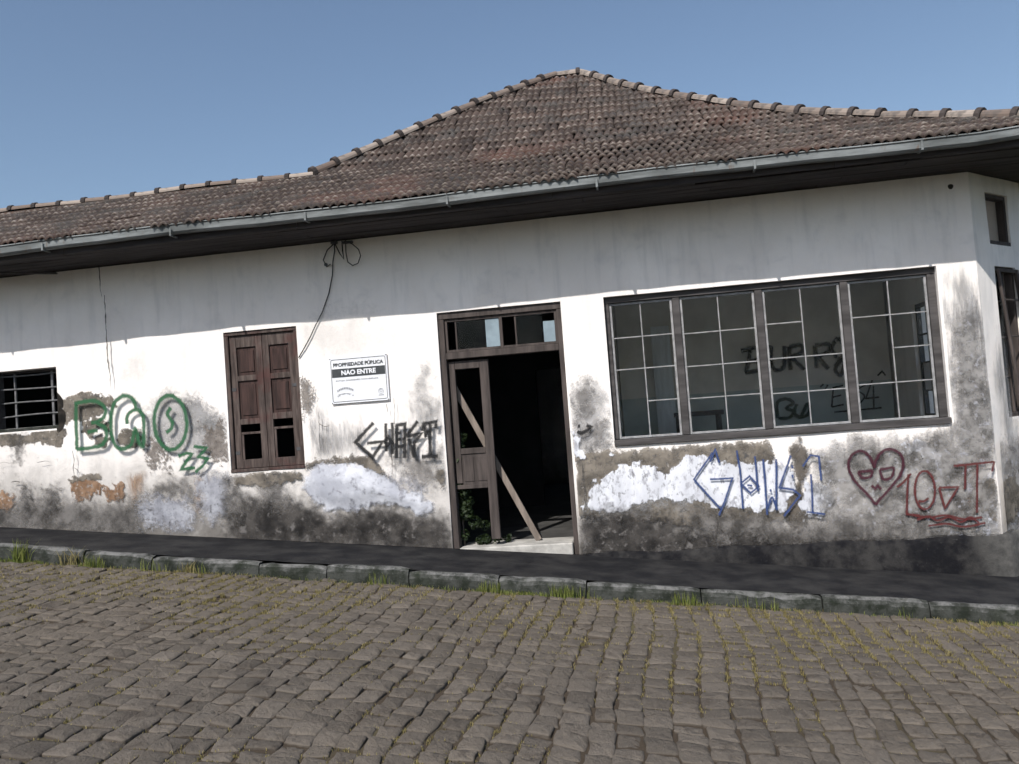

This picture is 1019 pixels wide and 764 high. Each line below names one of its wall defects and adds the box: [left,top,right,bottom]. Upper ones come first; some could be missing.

crack [99,268,111,386]
flaking render [0,391,173,474]
flaking render [67,473,125,503]
flaking render [197,416,228,466]
leakage [0,472,449,548]
leakage [391,447,445,489]
peeling [570,430,831,533]
leakage [580,279,1019,555]